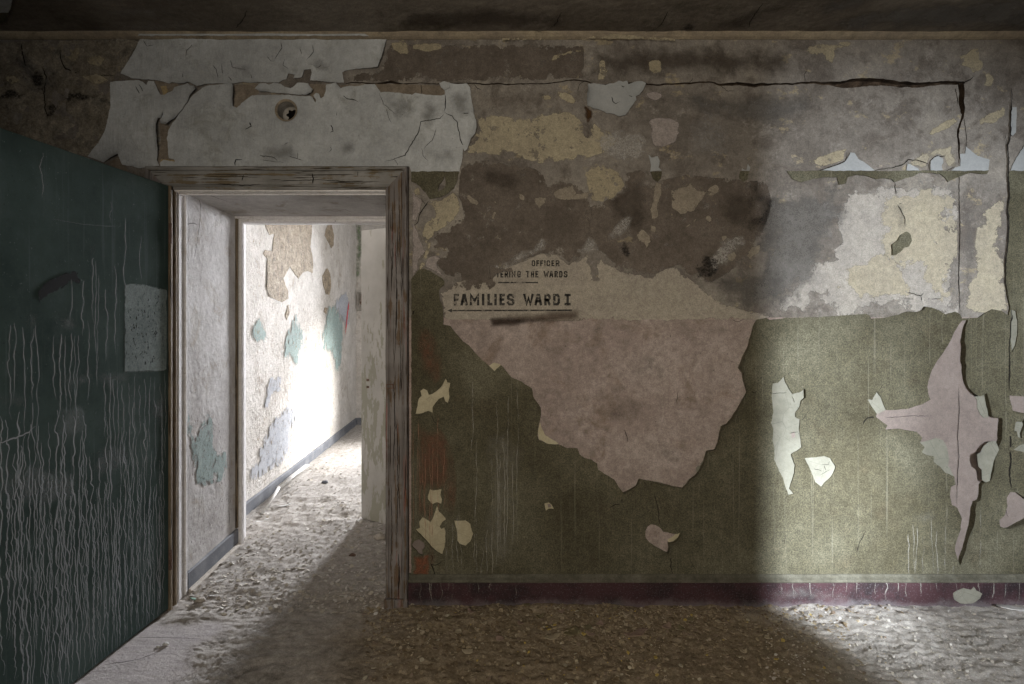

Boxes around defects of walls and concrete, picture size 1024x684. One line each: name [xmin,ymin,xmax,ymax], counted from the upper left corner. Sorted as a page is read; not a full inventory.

peeling [88,33,477,276]
spalling [263,225,331,320]
peeling [587,81,646,116]
crack [345,70,974,301]
crack [1005,89,1013,391]
peeling [415,379,450,414]
peeling [443,319,756,574]
peeling [771,373,835,495]
peeling [863,320,999,561]
crack [1007,436,1015,488]